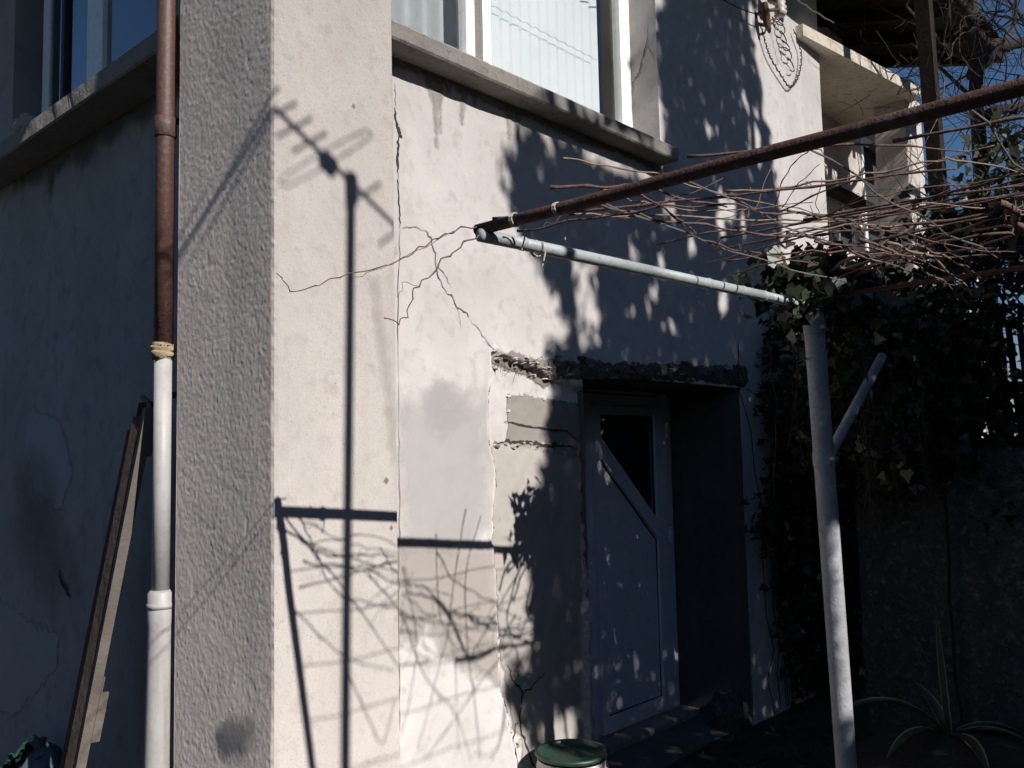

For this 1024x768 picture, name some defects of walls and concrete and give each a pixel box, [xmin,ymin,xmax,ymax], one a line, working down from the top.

crack [394,87,497,357]
damp [392,56,658,170]
flaking render [488,350,749,768]
crack [508,666,545,768]